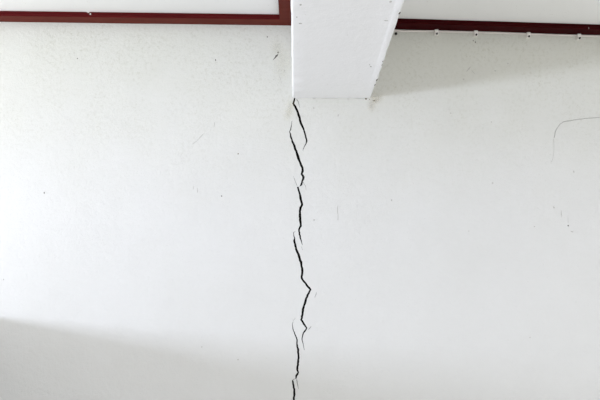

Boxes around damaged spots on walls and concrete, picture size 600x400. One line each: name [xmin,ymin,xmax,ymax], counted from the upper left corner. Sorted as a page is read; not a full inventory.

crack [289,98,317,400]